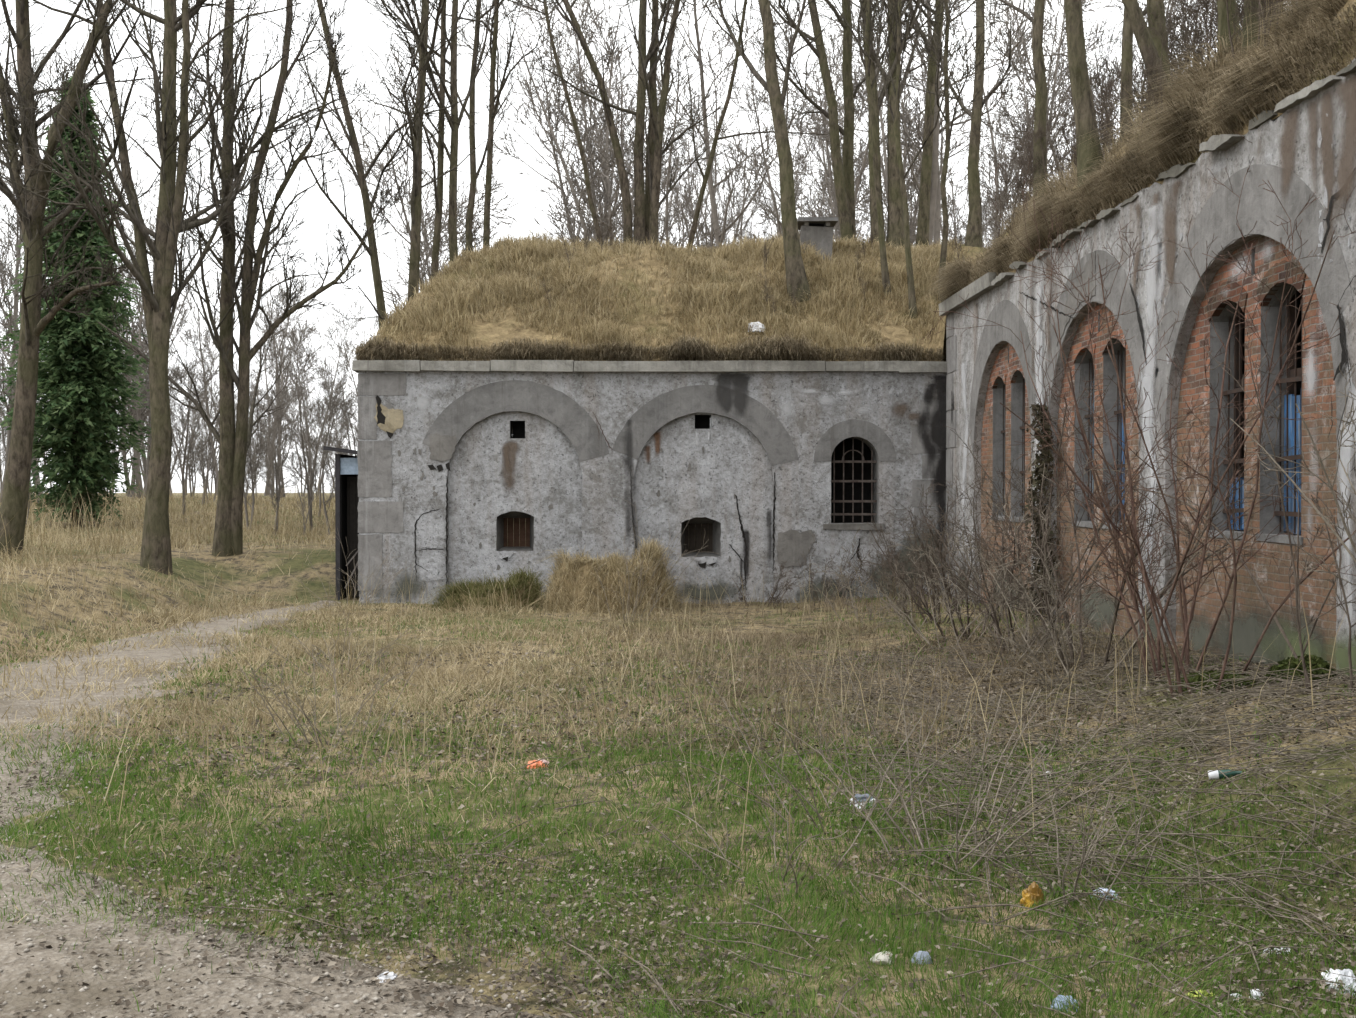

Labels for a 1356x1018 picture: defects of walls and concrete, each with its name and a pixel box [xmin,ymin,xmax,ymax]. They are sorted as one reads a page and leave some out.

water stain [1280,76,1356,237]
crack [1321,167,1356,253]
flaking render [374,394,462,581]
water stain [717,374,749,413]
water stain [919,364,968,543]
water stain [1032,258,1052,491]
crack [1328,276,1356,437]
water stain [1340,364,1356,574]